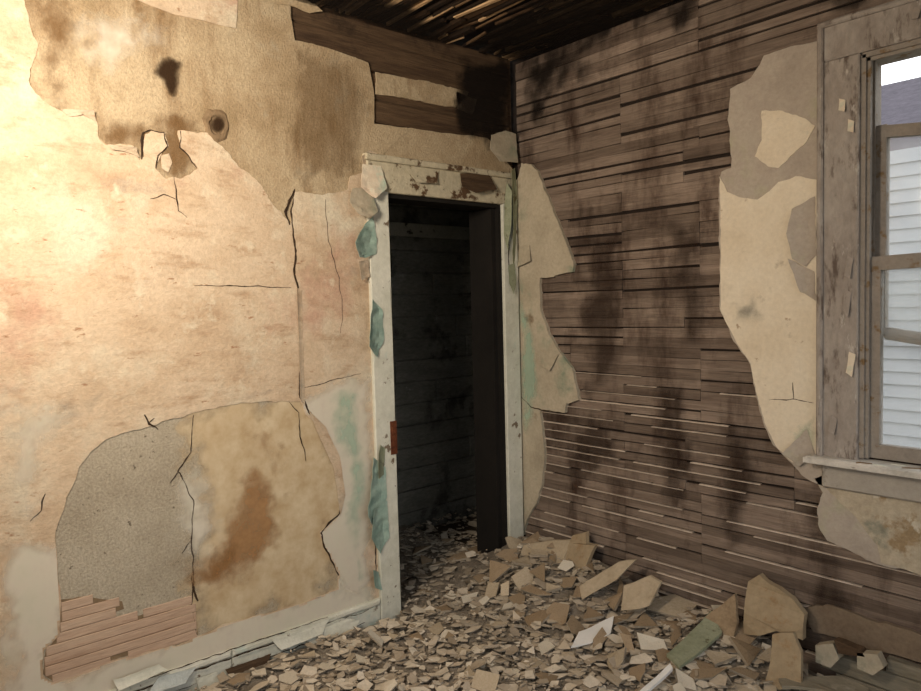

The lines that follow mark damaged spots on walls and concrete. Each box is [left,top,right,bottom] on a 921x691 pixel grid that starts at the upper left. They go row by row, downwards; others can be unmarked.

damp [156,59,180,95]
flaking render [24,0,518,294]
peeling [838,99,854,132]
crack [170,415,199,634]
flaking render [2,377,389,691]
damp [170,401,339,644]
crack [196,189,356,576]
peeling [369,300,384,356]
damp [581,428,608,467]
peeling [846,352,856,377]